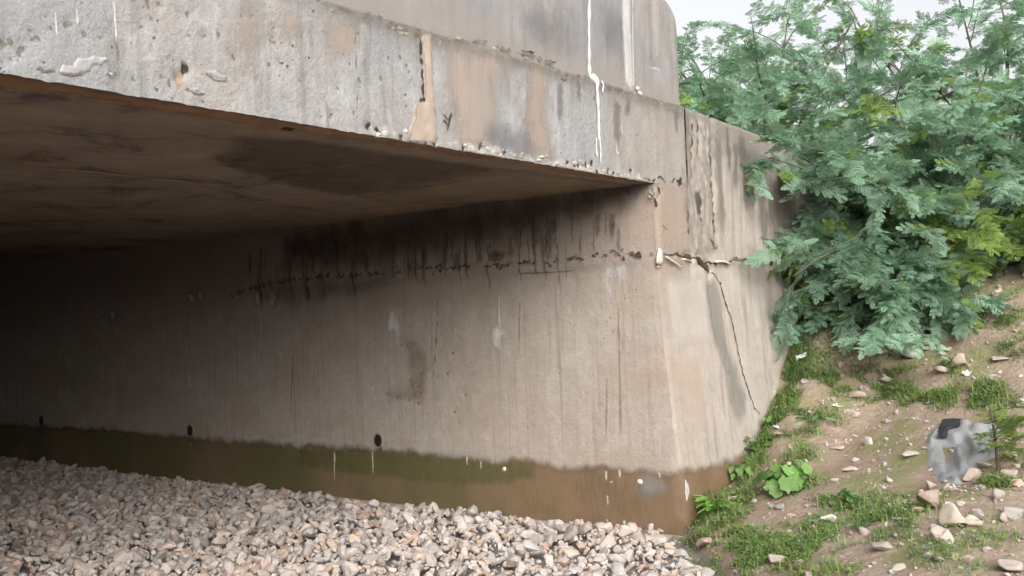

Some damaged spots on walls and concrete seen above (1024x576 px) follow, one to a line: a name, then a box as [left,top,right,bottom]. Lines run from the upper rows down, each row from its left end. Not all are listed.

water stain [221,141,633,261]
peeling [365,46,661,207]
water stain [529,0,605,162]
crack [231,216,773,414]
water stain [0,422,746,536]